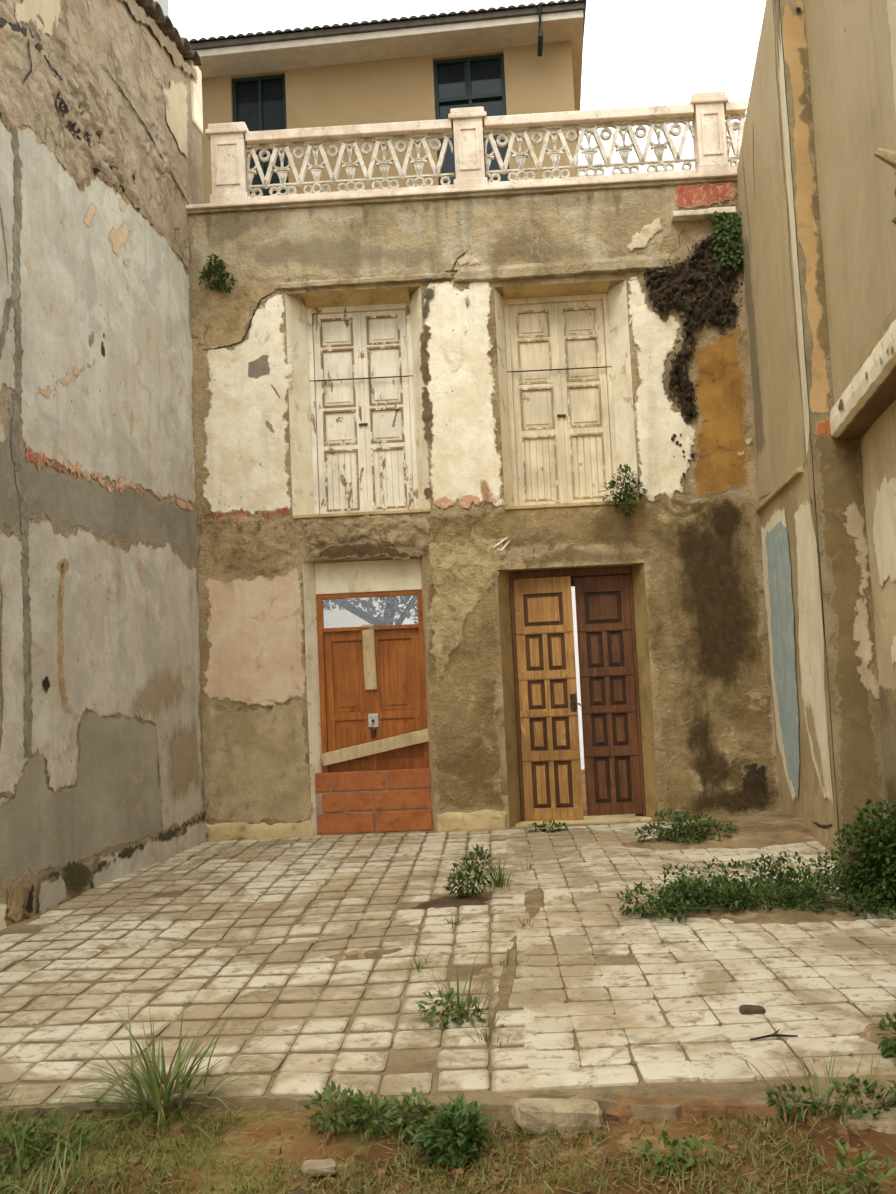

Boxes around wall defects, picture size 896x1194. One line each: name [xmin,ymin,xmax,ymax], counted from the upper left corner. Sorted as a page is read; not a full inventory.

crack [0,205,9,283]
spalling [0,0,273,349]
crack [202,291,277,350]
peeling [248,355,280,398]
crack [420,250,468,283]
spalling [797,47,830,359]
spalling [875,148,896,225]
spalling [201,506,507,694]
leakage [677,499,753,685]
peeling [761,498,834,809]
peeling [842,472,896,707]
leakage [687,713,769,815]